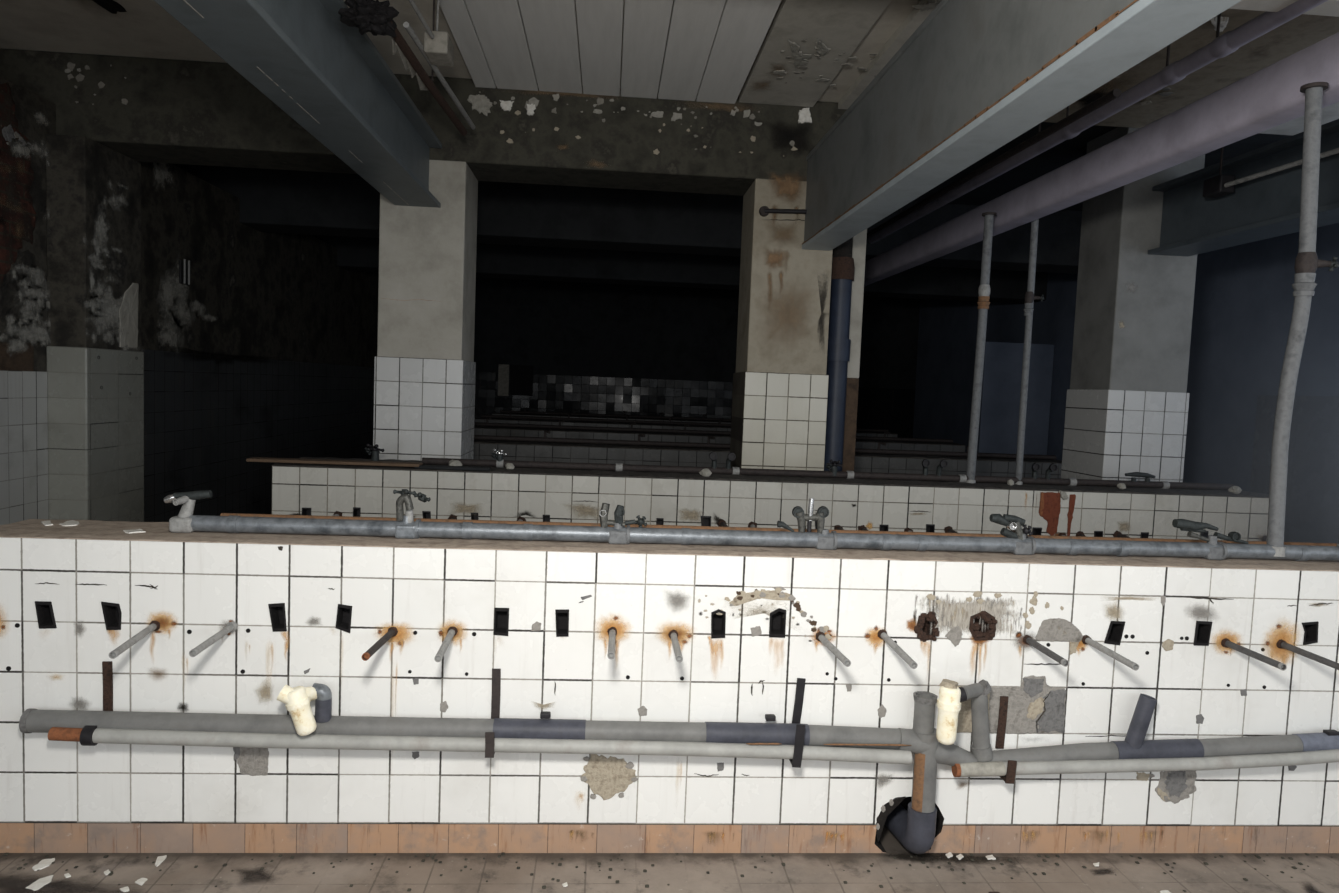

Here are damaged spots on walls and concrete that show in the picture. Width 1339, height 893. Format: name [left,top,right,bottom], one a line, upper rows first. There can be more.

water stain [767,176,800,296]
water stain [819,284,827,339]
rust [1026,490,1076,536]
rust [152,615,176,634]
peeling [698,586,832,641]
rust [908,611,940,642]
rust [970,611,997,654]
peeling [914,591,1083,655]
rust [1266,625,1295,660]
spalling [987,675,1067,734]
spalling [580,754,638,800]
spalling [1136,771,1197,804]